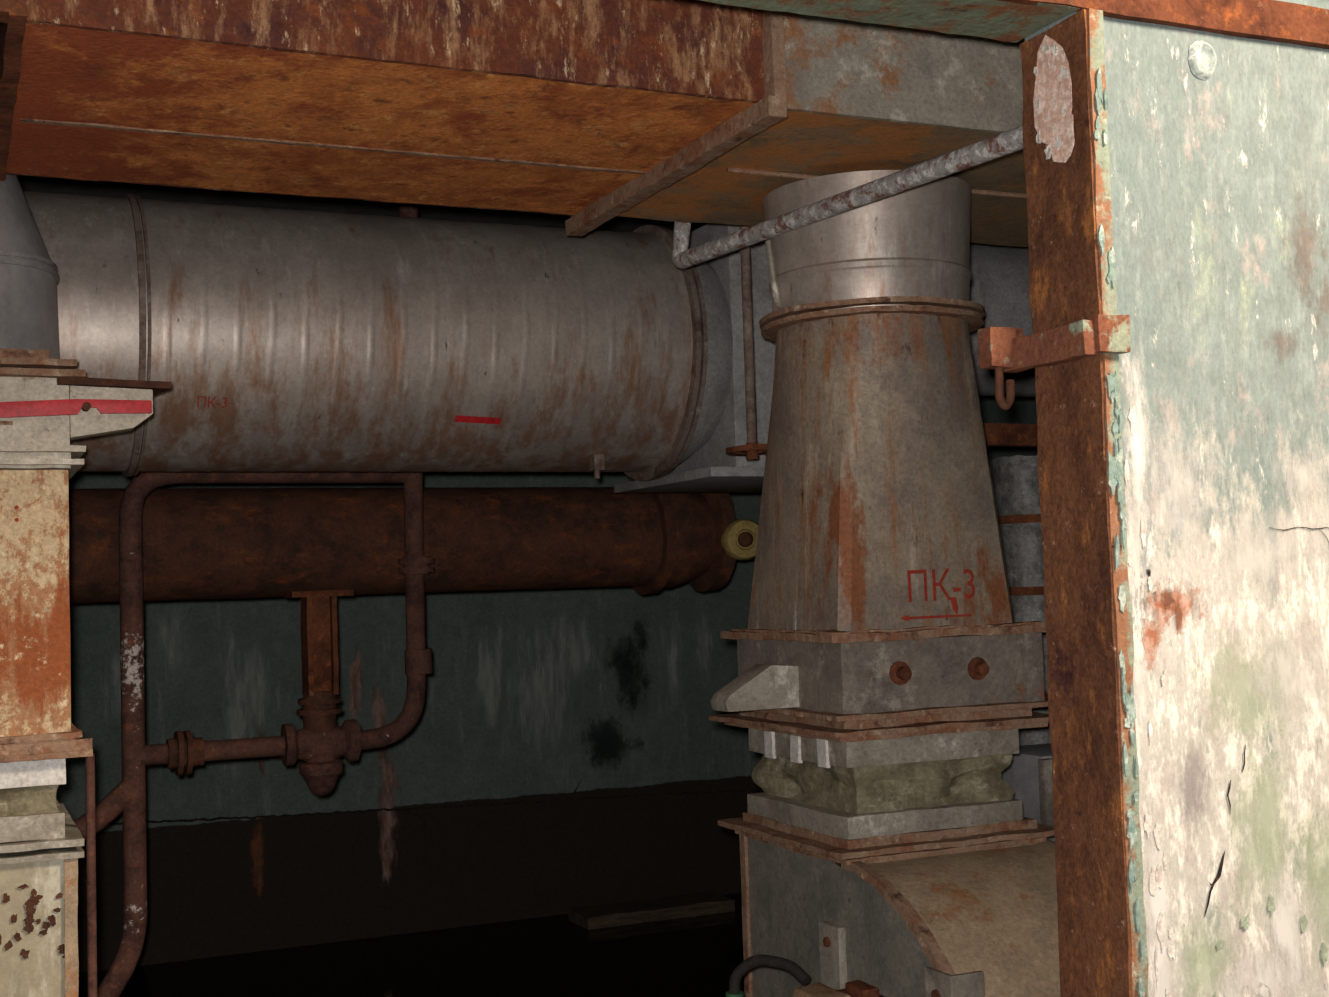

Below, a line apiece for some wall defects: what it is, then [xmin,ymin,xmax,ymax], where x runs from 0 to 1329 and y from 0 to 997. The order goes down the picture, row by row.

peeling [1033,35,1075,163]
peeling [1094,68,1108,146]
peeling [1098,223,1117,289]
damp [476,618,596,749]
damp [612,623,649,709]
peeling [1106,358,1175,997]
corrosion [1142,587,1197,669]
damp [588,721,641,765]
crack [1227,745,1246,811]
crack [1204,851,1225,917]
peeling [1213,880,1309,997]
peeling [1320,942,1328,968]